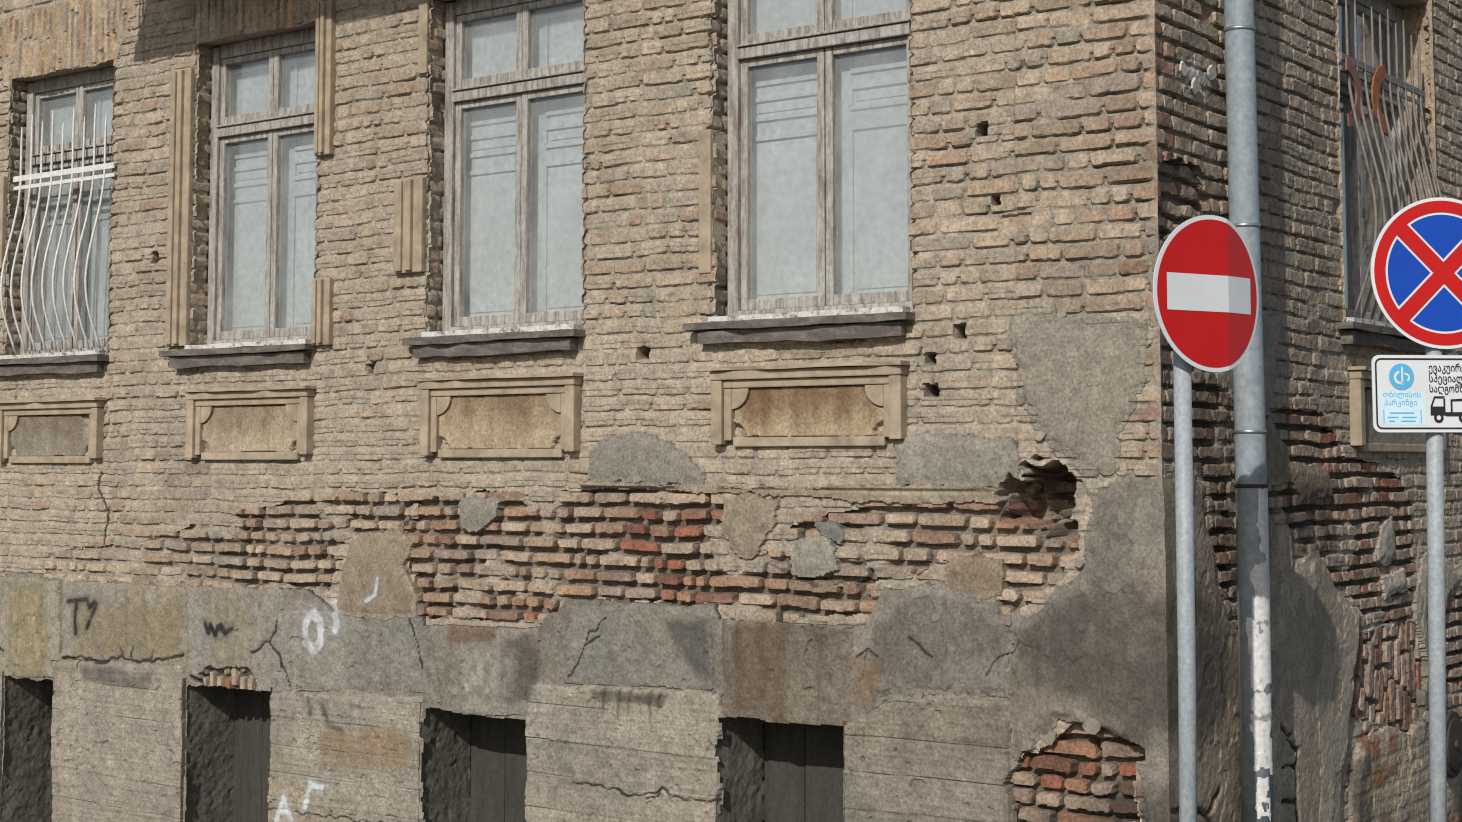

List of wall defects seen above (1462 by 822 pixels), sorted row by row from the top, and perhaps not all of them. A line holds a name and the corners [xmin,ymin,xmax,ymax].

spalling [1158,157,1210,236]
crack [97,472,110,546]
spalling [42,431,1091,714]
flaking render [1191,365,1241,822]
flaking render [1262,312,1462,822]
crack [250,620,291,688]
crack [568,618,607,677]
flaking render [1162,471,1179,822]
crack [577,782,721,802]
spalling [1011,722,1146,822]
crack [1170,789,1219,822]
crack [1280,725,1298,822]